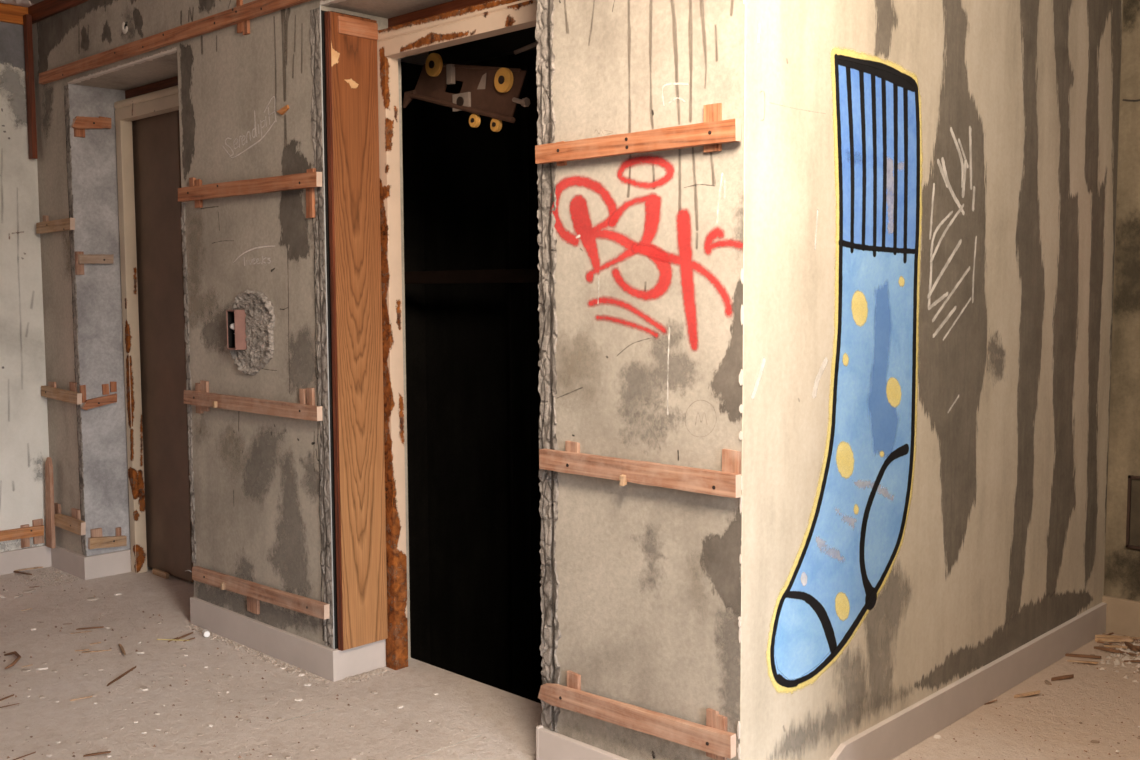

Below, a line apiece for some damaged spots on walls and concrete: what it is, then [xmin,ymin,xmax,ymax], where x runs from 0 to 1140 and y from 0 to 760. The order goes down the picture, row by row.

corrosion [378,0,533,52]
spalling [535,0,556,145]
leakage [671,0,718,124]
corrosion [124,267,145,521]
spalling [309,0,346,648]
corrosion [379,47,408,670]
spalling [537,162,558,450]
leakage [781,0,1140,757]
corrosion [133,545,146,573]
leakage [196,583,322,629]
leakage [221,427,319,596]
spalling [538,469,561,685]